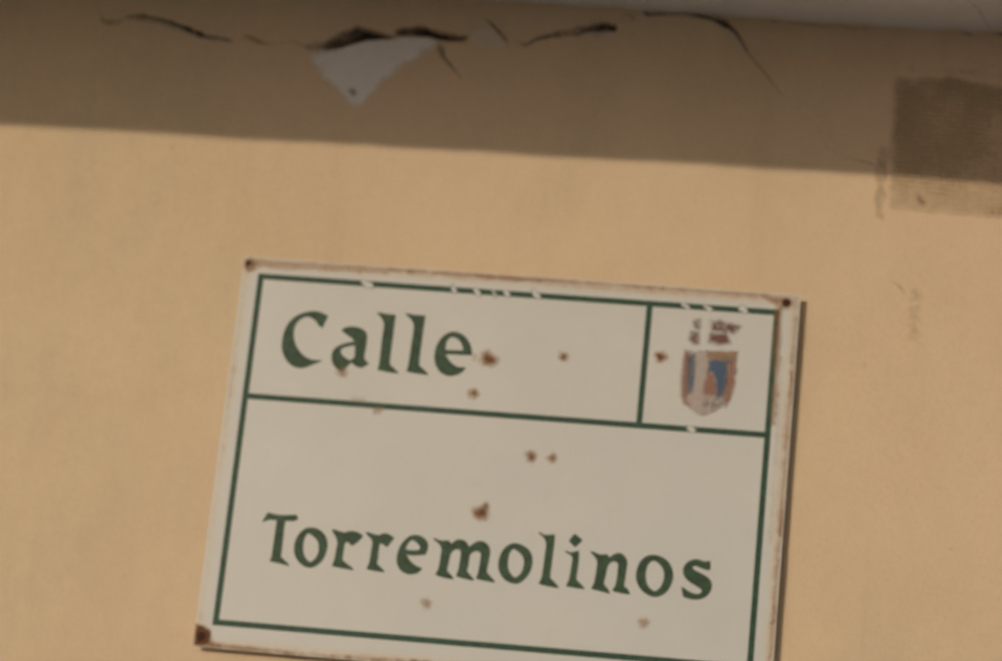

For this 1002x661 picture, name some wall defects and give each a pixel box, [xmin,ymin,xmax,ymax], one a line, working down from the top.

crack [99,14,261,45]
flaking render [305,27,464,112]
crack [555,23,617,39]
crack [639,11,772,83]